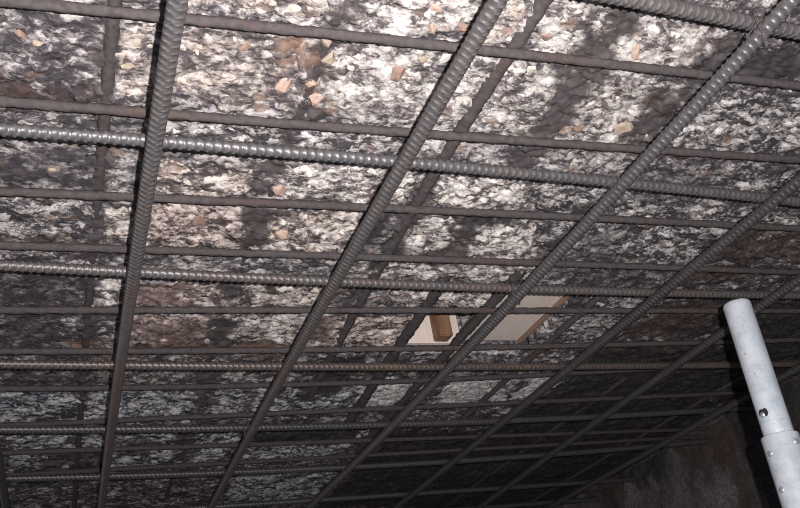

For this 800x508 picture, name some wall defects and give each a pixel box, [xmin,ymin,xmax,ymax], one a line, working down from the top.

damp [321,0,365,30]
damp [279,104,326,146]
damp [506,2,645,168]
damp [619,77,697,143]
damp [692,38,743,68]
damp [246,157,288,194]
damp [235,206,284,247]
spalling [0,0,620,508]
damp [423,221,491,266]
spalling [304,0,800,508]
damp [204,281,254,348]
damp [170,370,223,463]